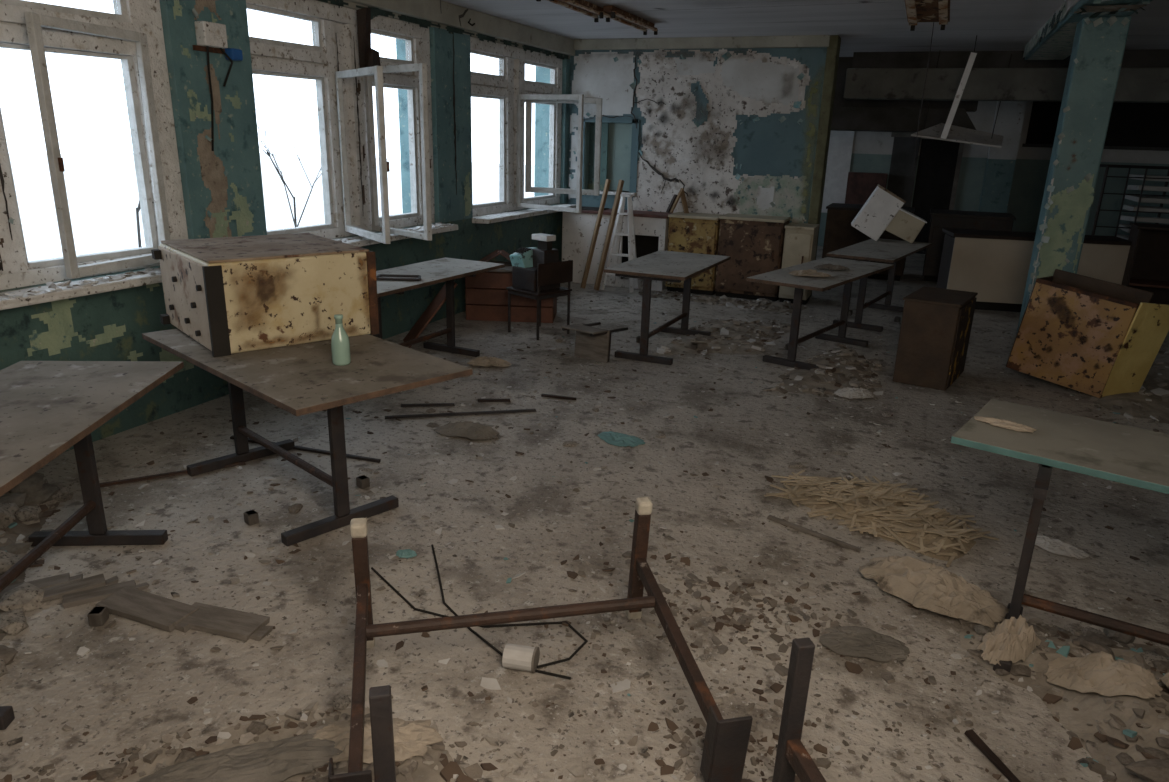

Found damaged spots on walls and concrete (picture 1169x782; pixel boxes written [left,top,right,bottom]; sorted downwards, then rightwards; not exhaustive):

peeling [173,0,221,23]
peeling [0,165,14,271]
flaking render [187,64,254,238]
peeling [317,0,812,223]
peeling [1028,159,1095,298]
peeling [27,299,126,357]